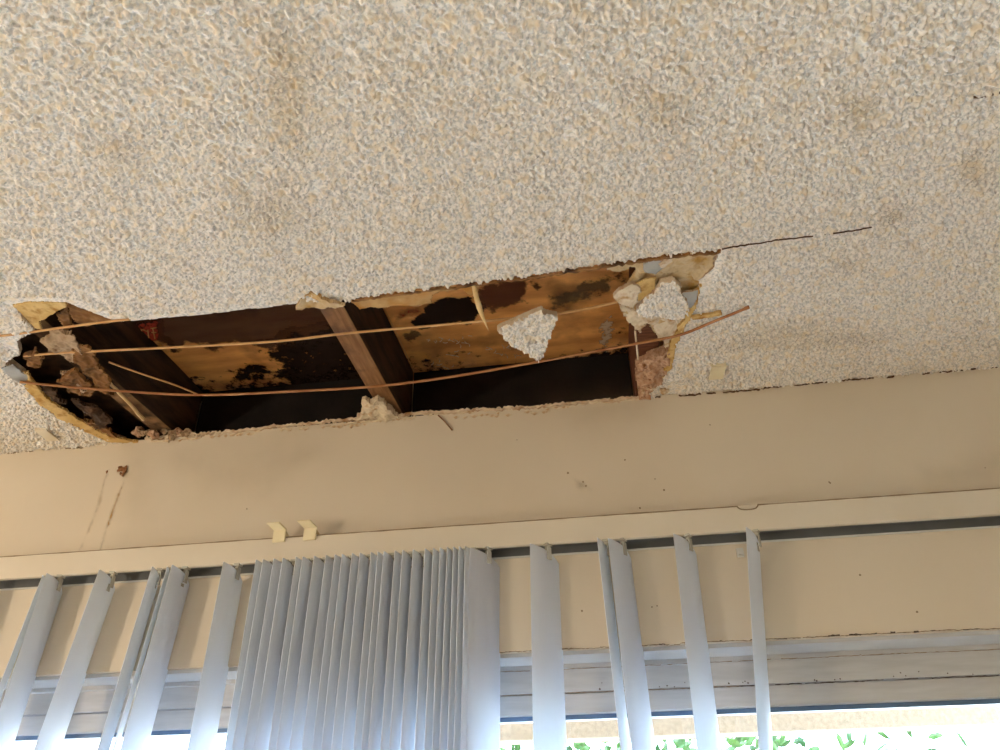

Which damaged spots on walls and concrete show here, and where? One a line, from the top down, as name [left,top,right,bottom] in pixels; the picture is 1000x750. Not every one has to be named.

crack [722,227,872,250]
leakage [403,276,541,341]
leakage [551,273,625,310]
peeling [613,281,641,308]
leakage [134,304,361,401]
leakage [561,328,629,360]
spalling [396,345,670,421]
spalling [144,417,382,443]